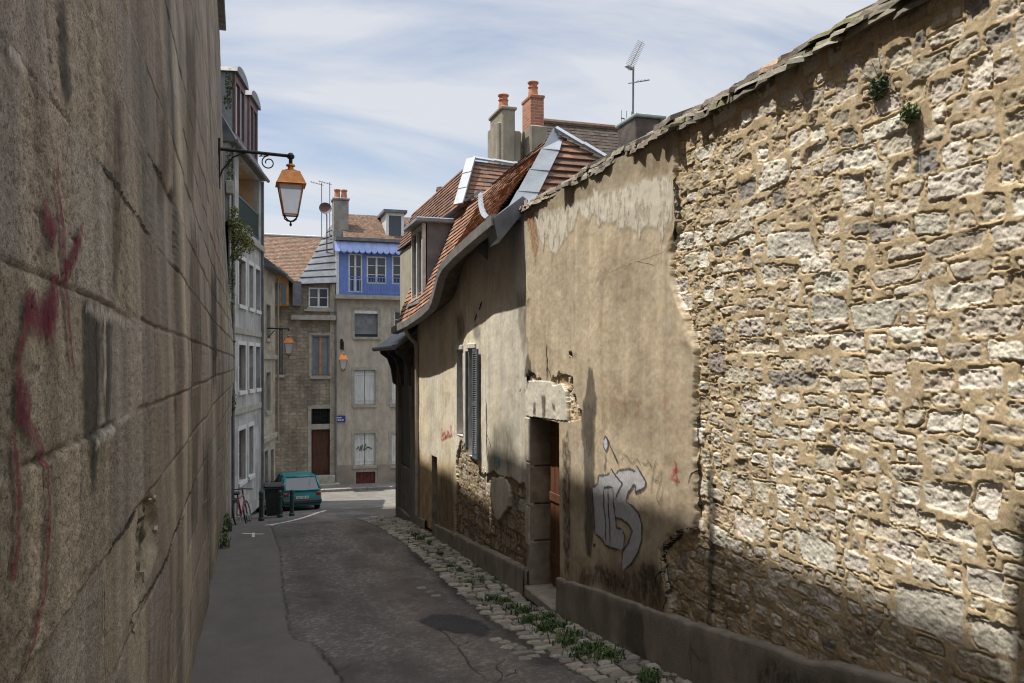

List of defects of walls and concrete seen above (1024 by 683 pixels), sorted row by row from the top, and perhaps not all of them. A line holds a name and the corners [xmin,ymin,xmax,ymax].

flaking render [519,370,582,422]
flaking render [454,440,527,570]
flaking render [660,520,710,624]